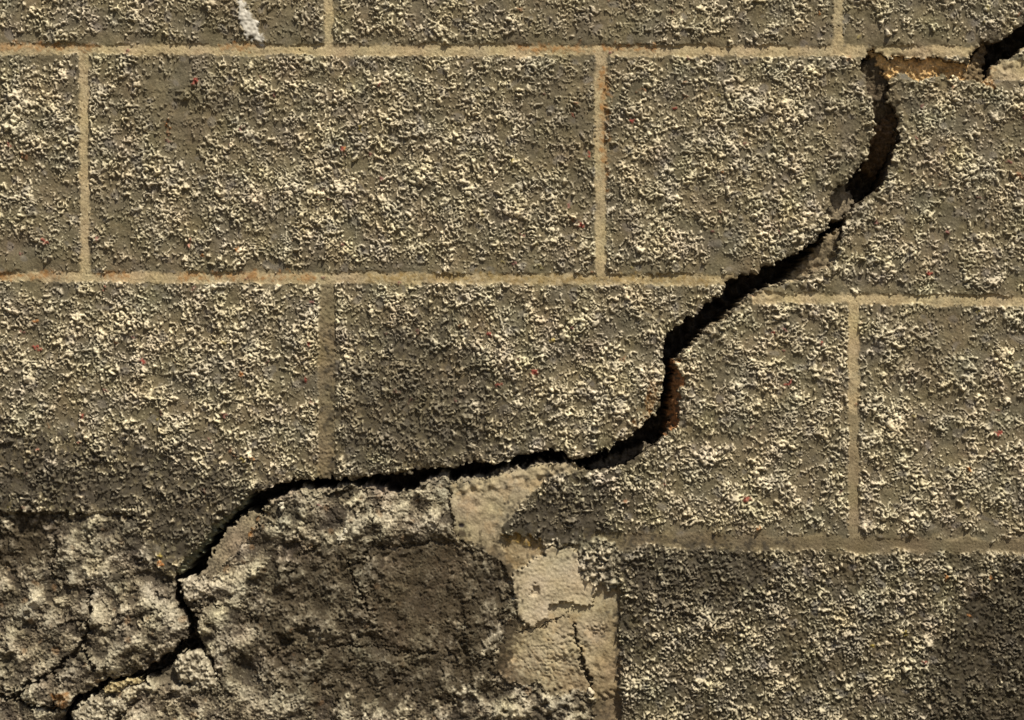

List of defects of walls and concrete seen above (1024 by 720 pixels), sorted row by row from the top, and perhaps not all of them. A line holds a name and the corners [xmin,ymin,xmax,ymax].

crack [134,24,1024,685]
crack [48,526,70,587]
crack [0,589,128,720]
crack [115,698,142,720]
crack [212,658,223,690]
spalling [0,462,624,720]